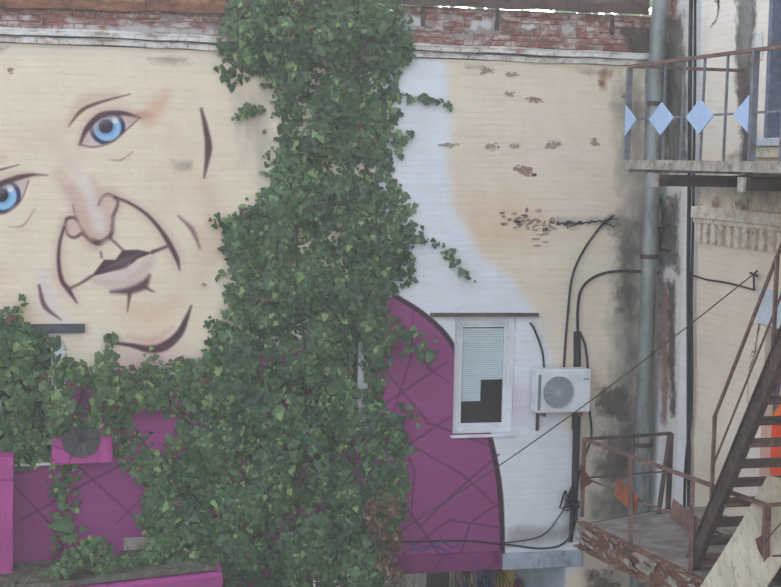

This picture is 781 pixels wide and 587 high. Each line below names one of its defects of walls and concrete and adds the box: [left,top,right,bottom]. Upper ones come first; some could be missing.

damp [735,0,755,106]
damp [740,127,748,161]
spalling [513,165,537,177]
peeling [499,208,557,247]
damp [659,193,680,274]
damp [596,231,636,441]
peeling [574,523,617,558]
peeling [623,552,695,587]